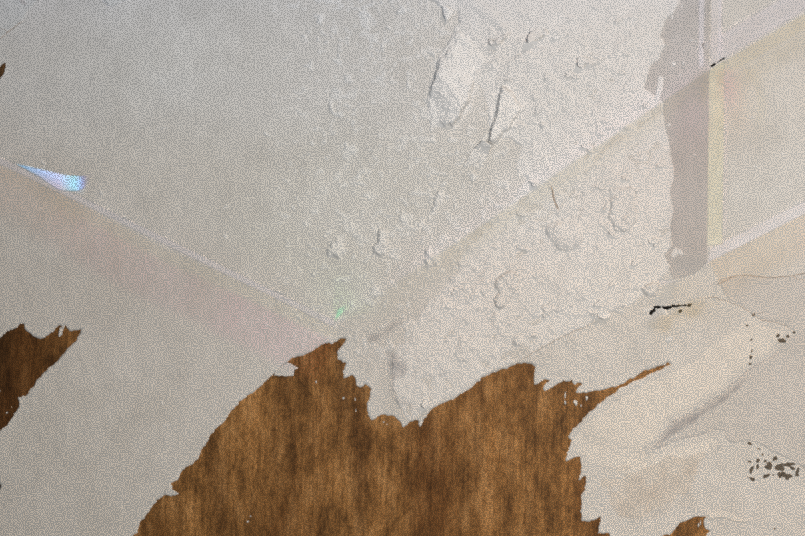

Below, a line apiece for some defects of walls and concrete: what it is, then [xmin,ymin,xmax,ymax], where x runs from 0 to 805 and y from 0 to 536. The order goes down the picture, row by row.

peeling [133,0,680,536]
peeling [0,324,81,430]
crack [650,273,804,450]
peeling [747,442,800,481]
peeling [663,516,709,536]